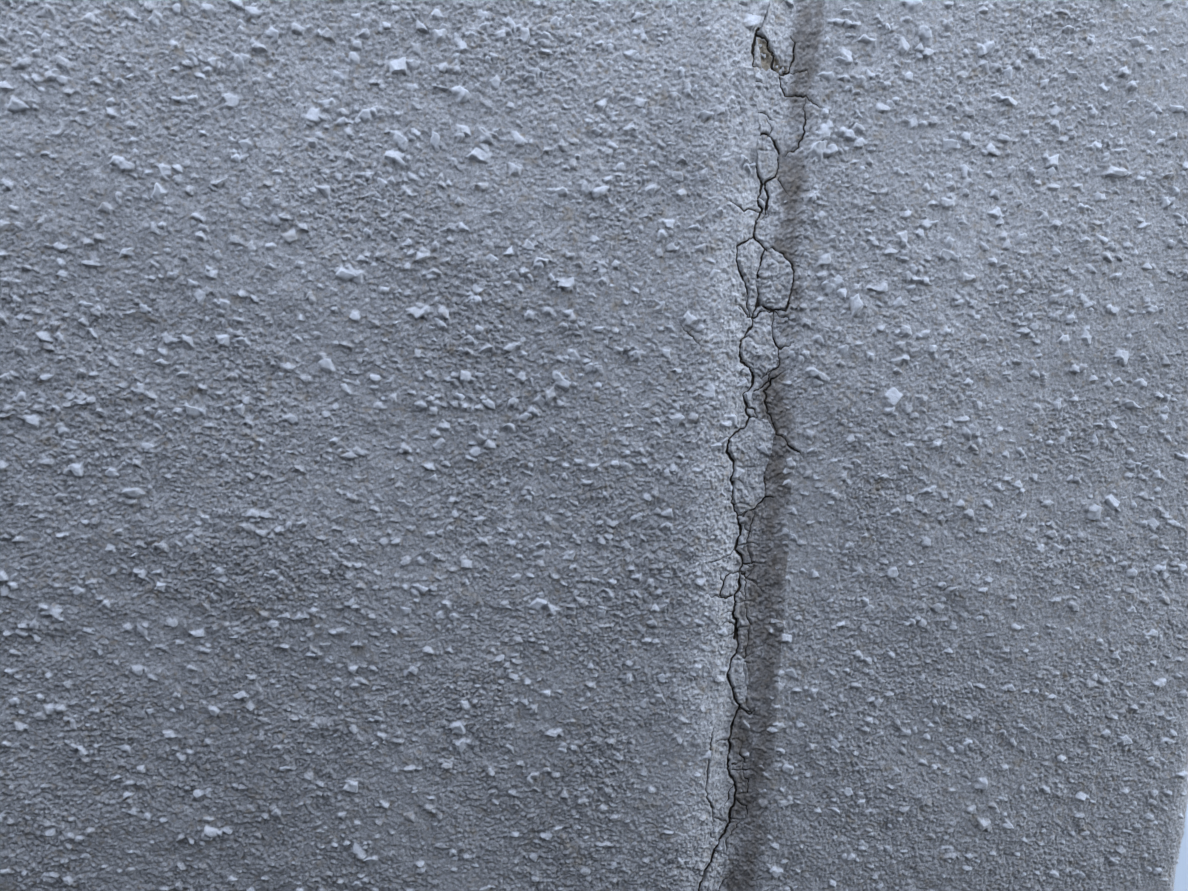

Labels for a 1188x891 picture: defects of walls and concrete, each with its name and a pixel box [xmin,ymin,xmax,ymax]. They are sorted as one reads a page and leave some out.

crack [698,0,819,891]